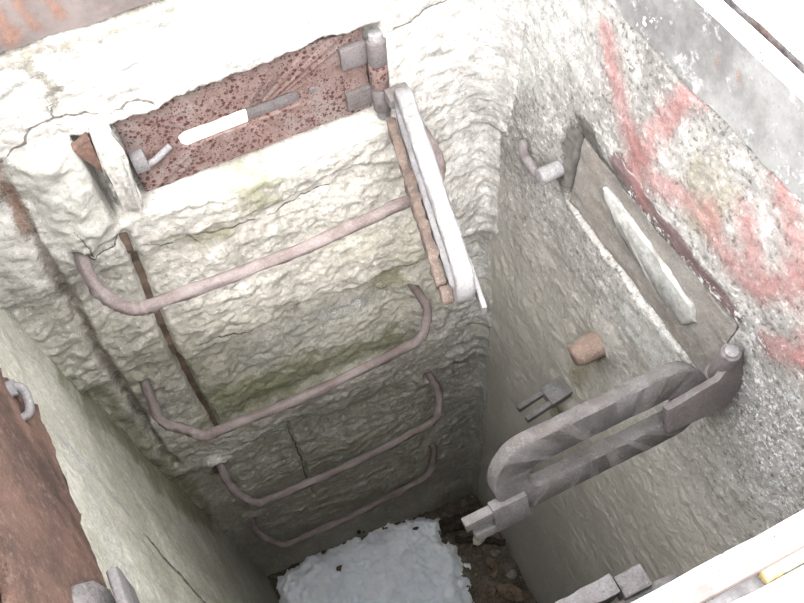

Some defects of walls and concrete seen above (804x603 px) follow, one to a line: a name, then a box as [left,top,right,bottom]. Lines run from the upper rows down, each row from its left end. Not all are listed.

crack [7,98,155,157]
crack [287,424,314,493]